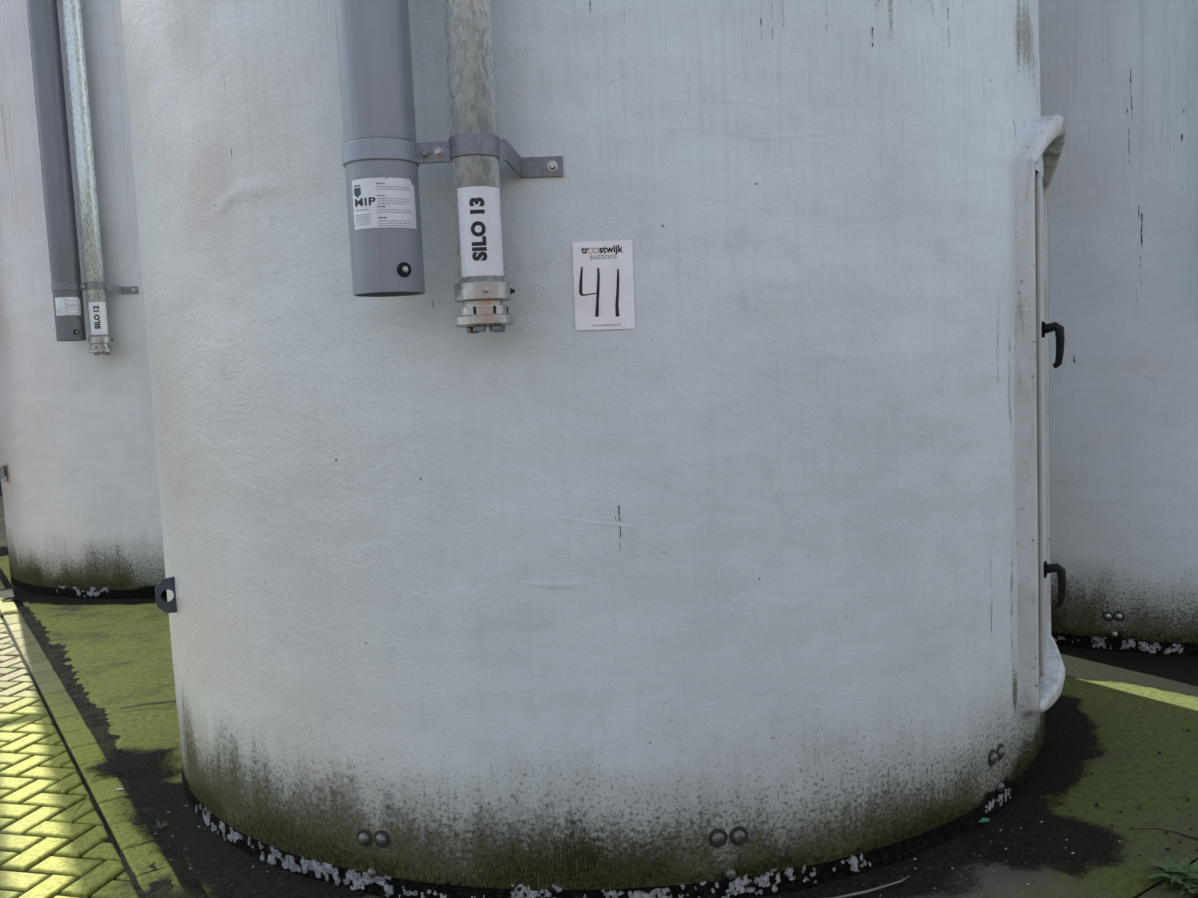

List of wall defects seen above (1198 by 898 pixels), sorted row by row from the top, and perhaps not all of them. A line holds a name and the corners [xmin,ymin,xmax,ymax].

leakage [88,747,391,898]
leakage [757,695,1128,898]